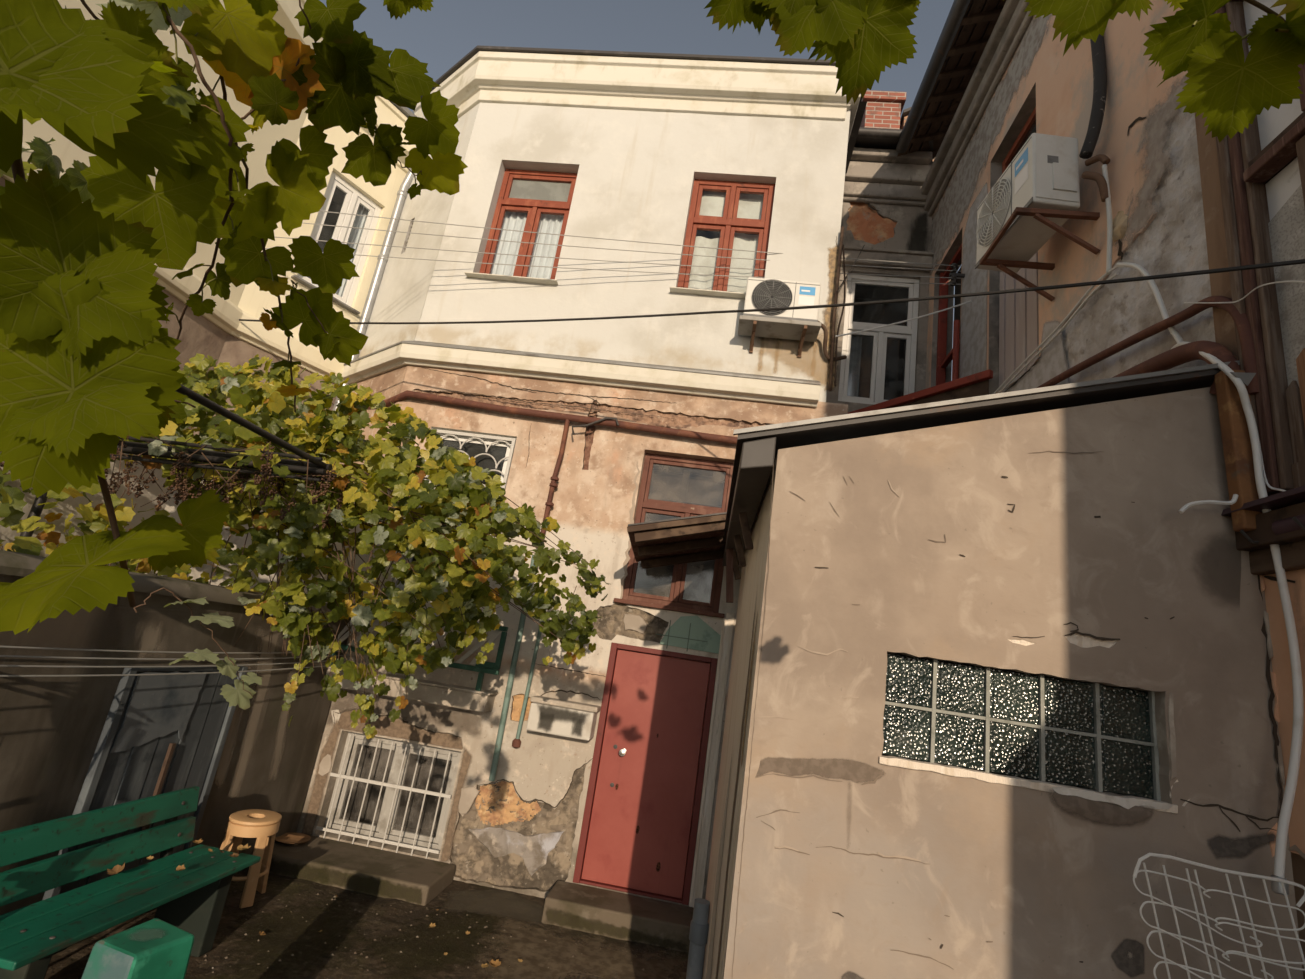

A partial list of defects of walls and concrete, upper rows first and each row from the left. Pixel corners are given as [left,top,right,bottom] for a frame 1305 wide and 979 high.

flaking render [824,202,897,390]
spalling [594,461,669,643]
spalling [1064,622,1120,648]
crack [1180,575,1295,857]
spalling [331,708,593,923]
damp [1112,939,1144,977]